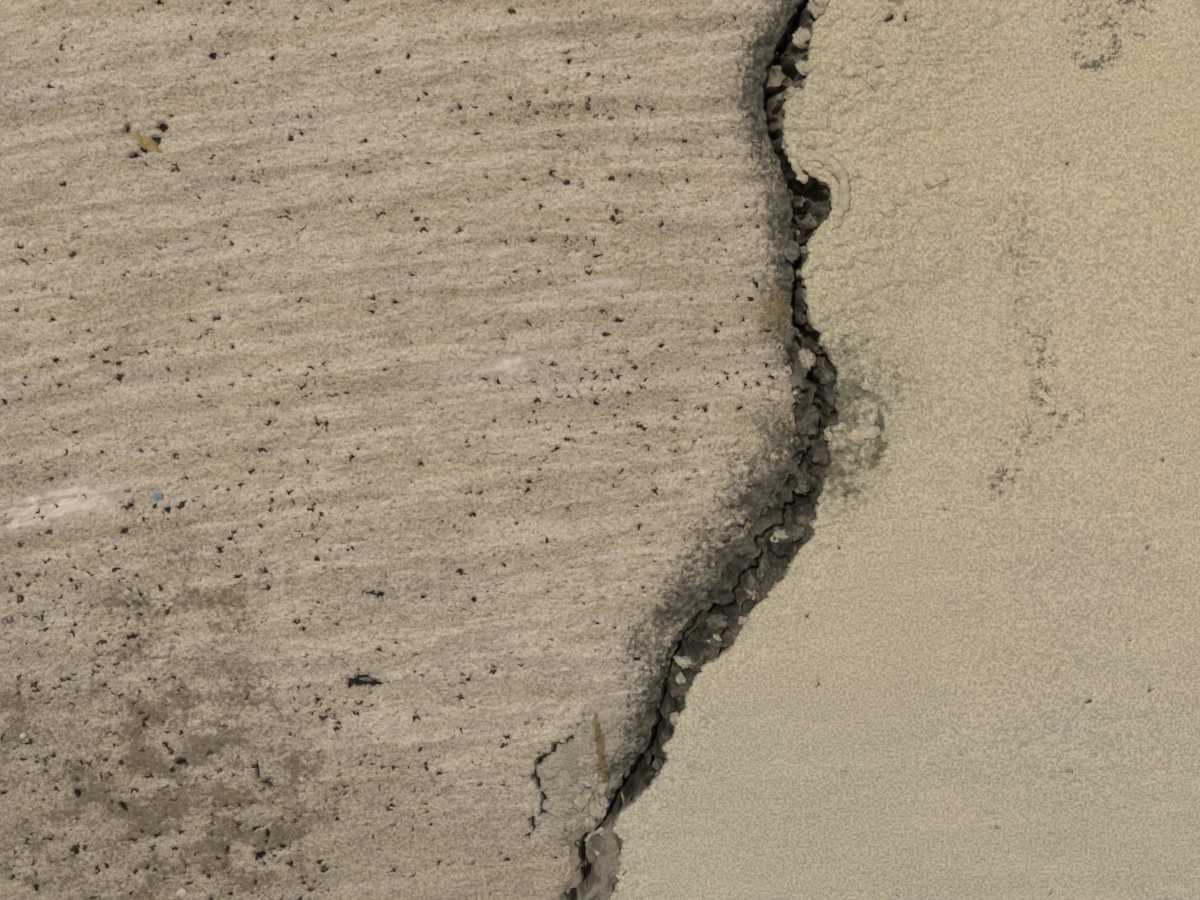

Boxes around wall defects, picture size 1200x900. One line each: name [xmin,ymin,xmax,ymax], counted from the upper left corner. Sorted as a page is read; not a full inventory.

crack [526,713,584,836]
crack [559,0,839,900]